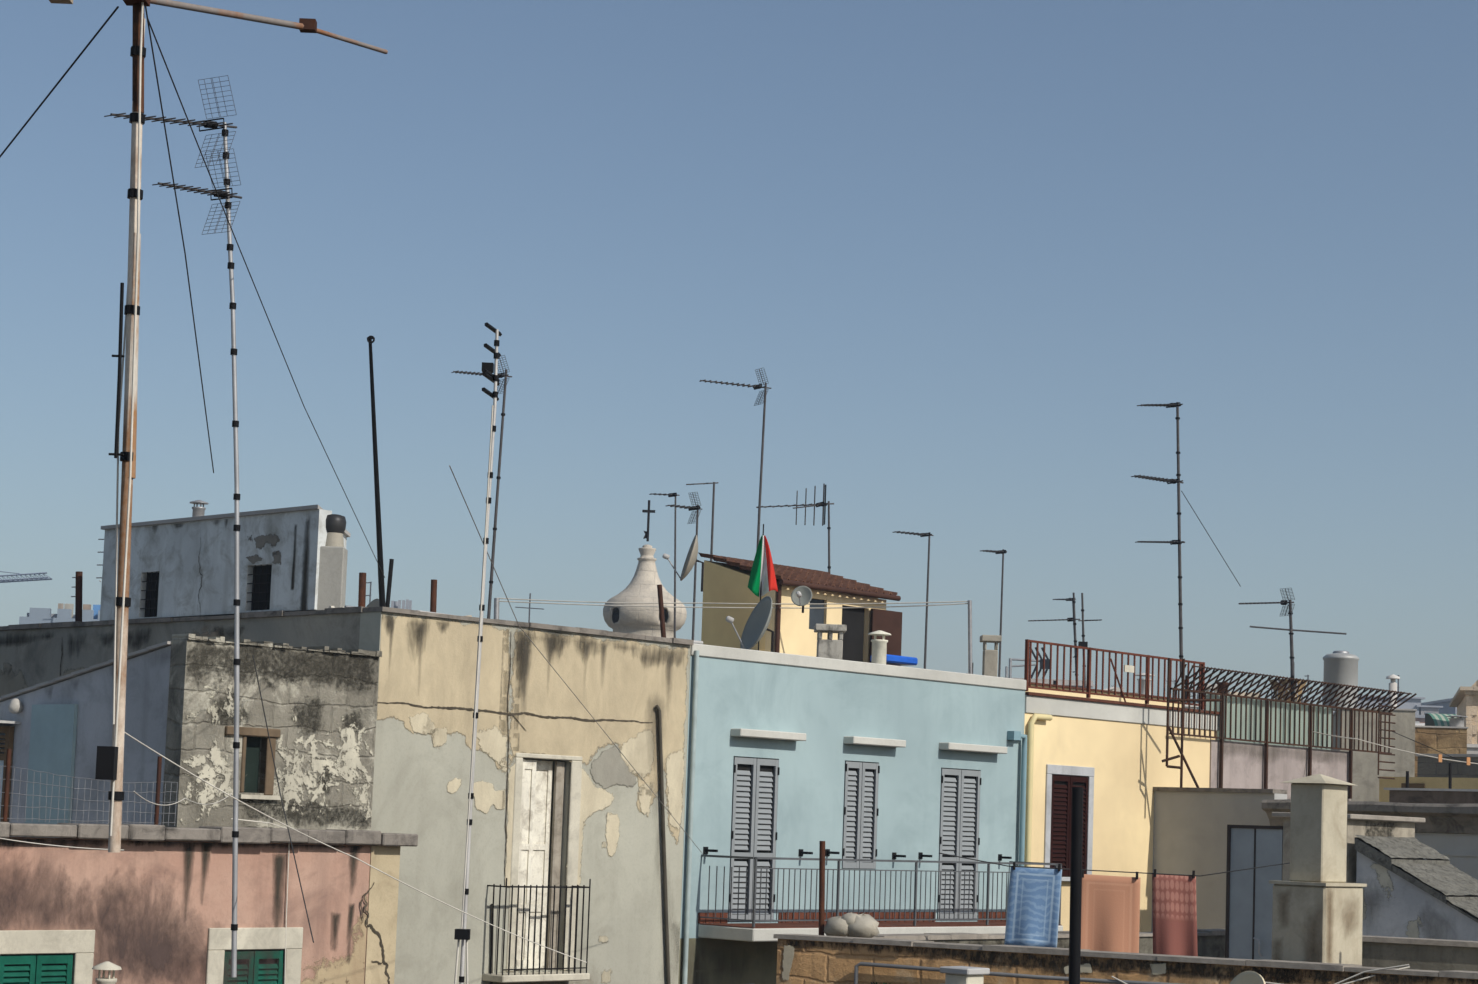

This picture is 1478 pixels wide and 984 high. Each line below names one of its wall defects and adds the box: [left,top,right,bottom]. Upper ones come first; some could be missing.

leakage [187,628,376,733]
leakage [516,633,531,681]
leakage [549,634,605,655]
peeling [180,674,245,826]
peeling [266,614,688,886]
mould [244,759,371,828]
leakage [0,838,103,847]
leakage [0,871,238,984]
crack [360,883,390,984]
peeling [782,945,795,981]
peeling [1064,963,1092,975]